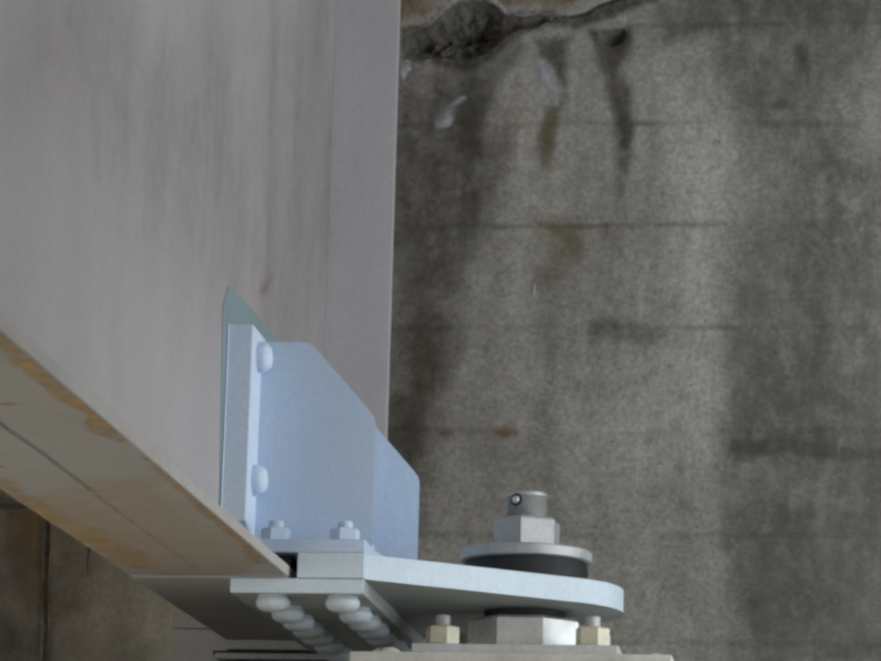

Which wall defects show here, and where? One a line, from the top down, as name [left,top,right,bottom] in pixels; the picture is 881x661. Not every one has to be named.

spalling [400,0,553,79]
spalling [595,28,629,50]
water stain [600,42,632,168]
water stain [396,78,489,293]
corrosion [0,336,127,441]
water stain [389,302,446,468]